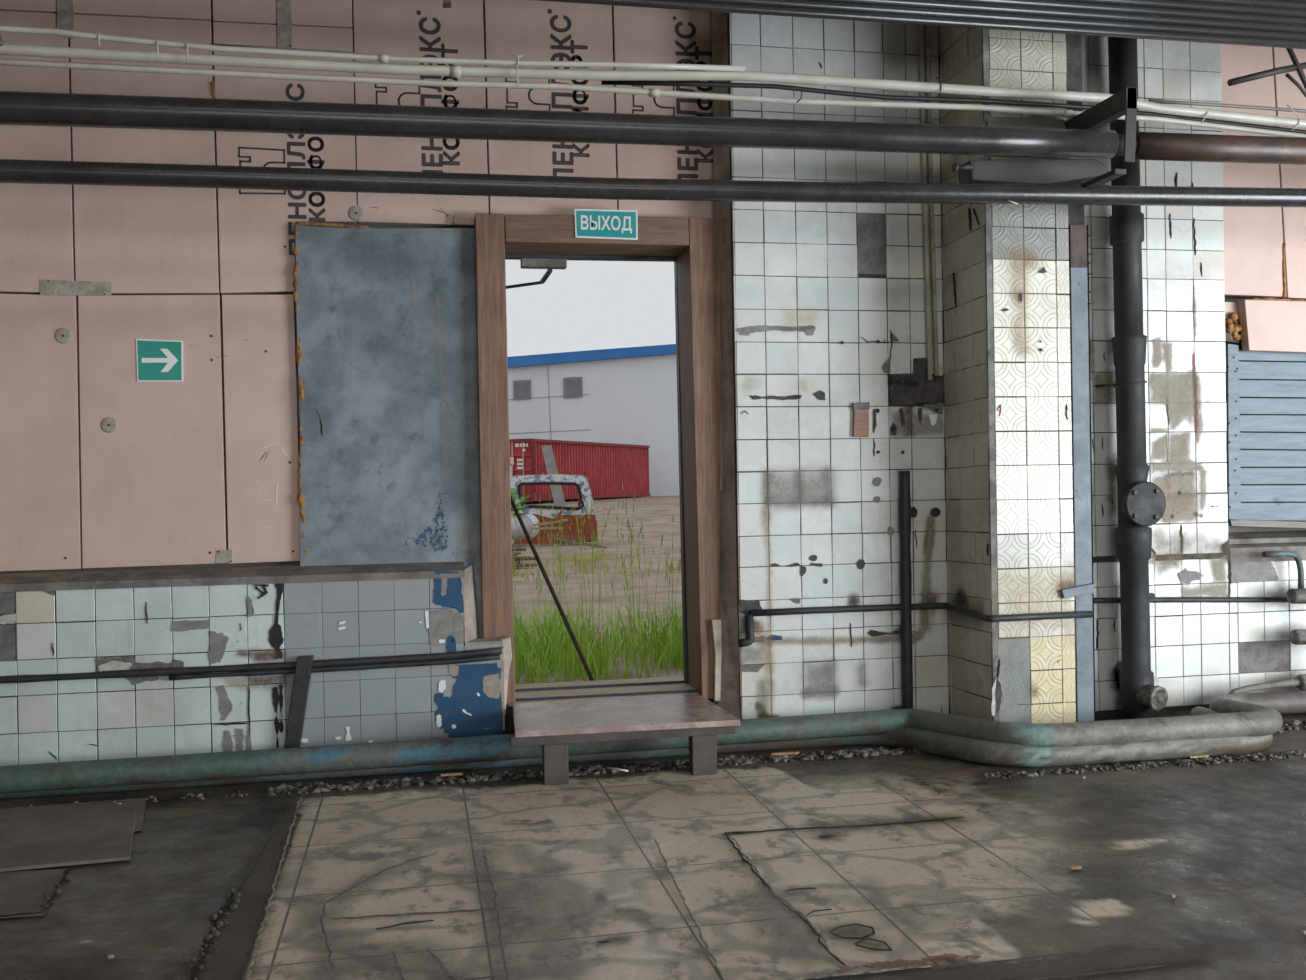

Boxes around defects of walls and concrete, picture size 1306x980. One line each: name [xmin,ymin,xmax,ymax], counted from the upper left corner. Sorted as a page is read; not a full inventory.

spalling [861,329,945,456]
peeling [401,491,451,552]
peeling [0,592,17,661]
peeling [419,570,512,738]
crack [180,793,304,980]
crack [319,850,516,980]
crack [654,838,724,980]
crack [722,817,1166,980]